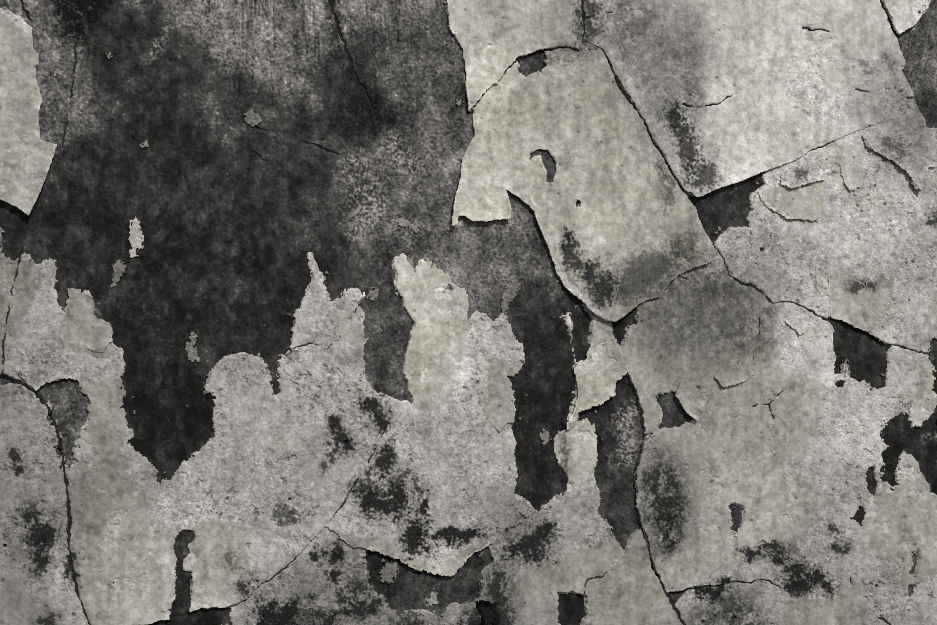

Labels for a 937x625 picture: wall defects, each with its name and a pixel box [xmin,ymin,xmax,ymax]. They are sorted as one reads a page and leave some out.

crack [504,0,695,205]
damp [666,104,717,195]
peeling [0,0,884,484]
crack [712,243,931,358]
peeling [827,271,896,390]
crack [0,222,91,625]
damp [237,539,382,625]
damp [349,390,488,560]
peeling [89,313,772,625]
damp [460,520,557,625]
crack [625,372,786,625]
peeling [865,405,937,496]